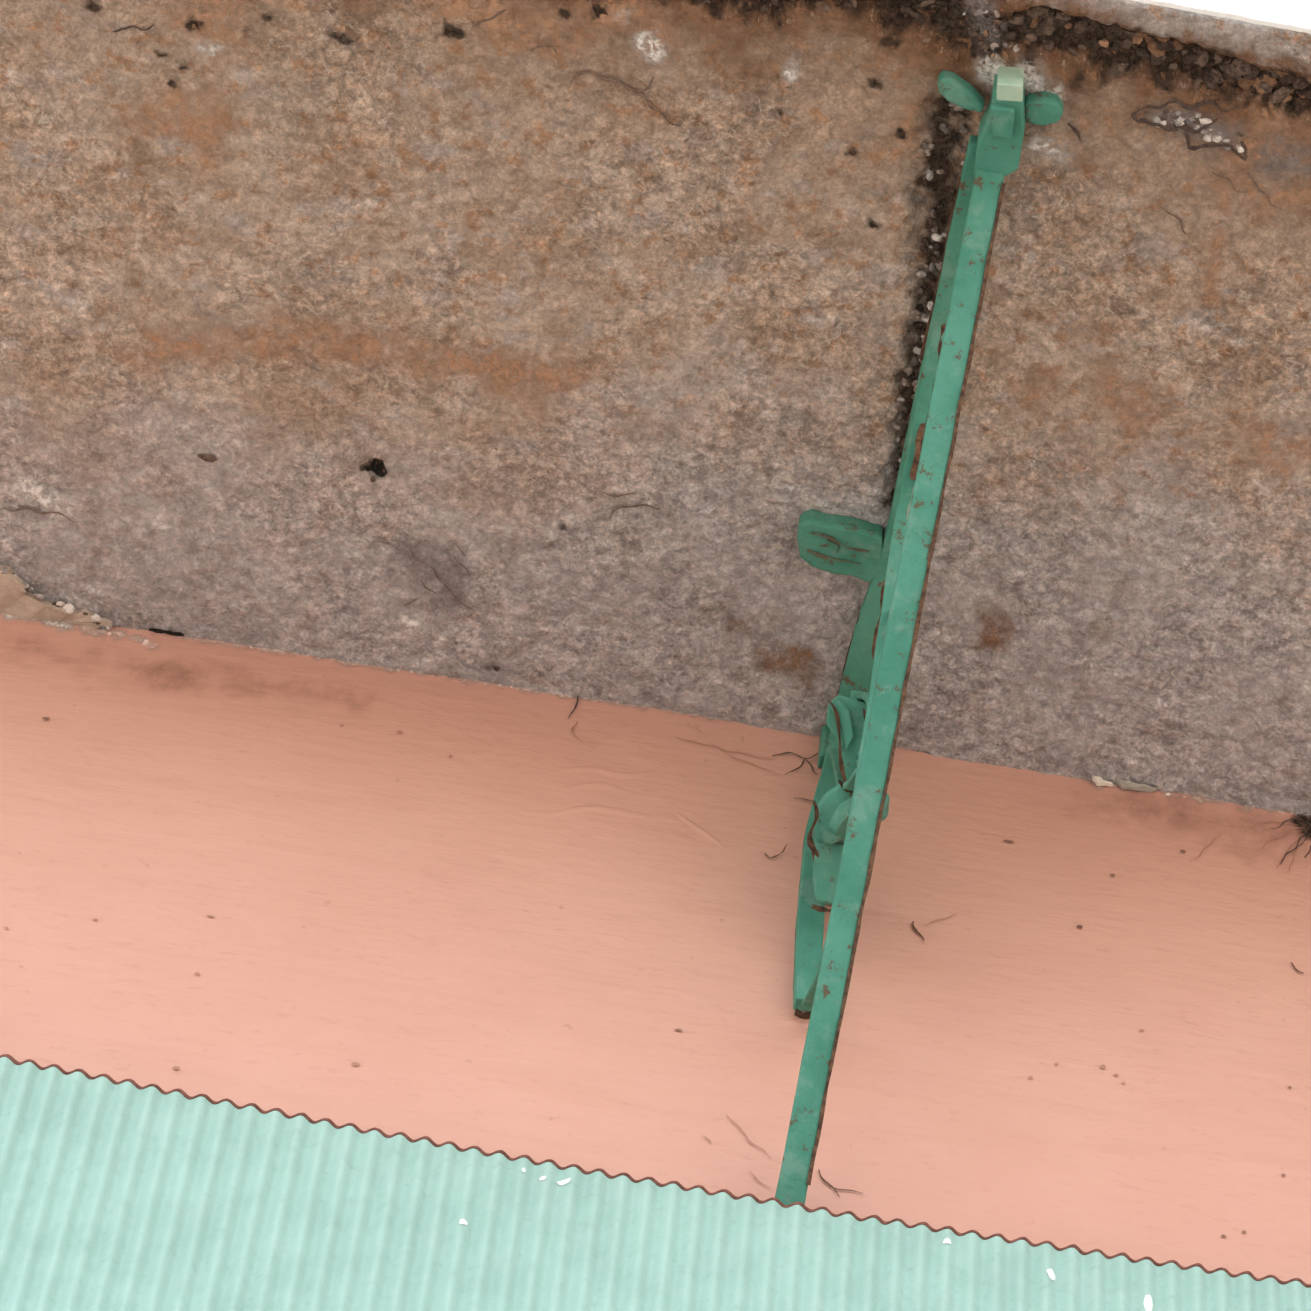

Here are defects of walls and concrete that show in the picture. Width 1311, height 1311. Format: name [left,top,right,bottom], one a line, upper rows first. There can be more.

spalling [185,17,202,31]
spalling [443,25,464,39]
spalling [511,0,1311,165]
spalling [893,98,970,471]
spalling [0,564,321,659]